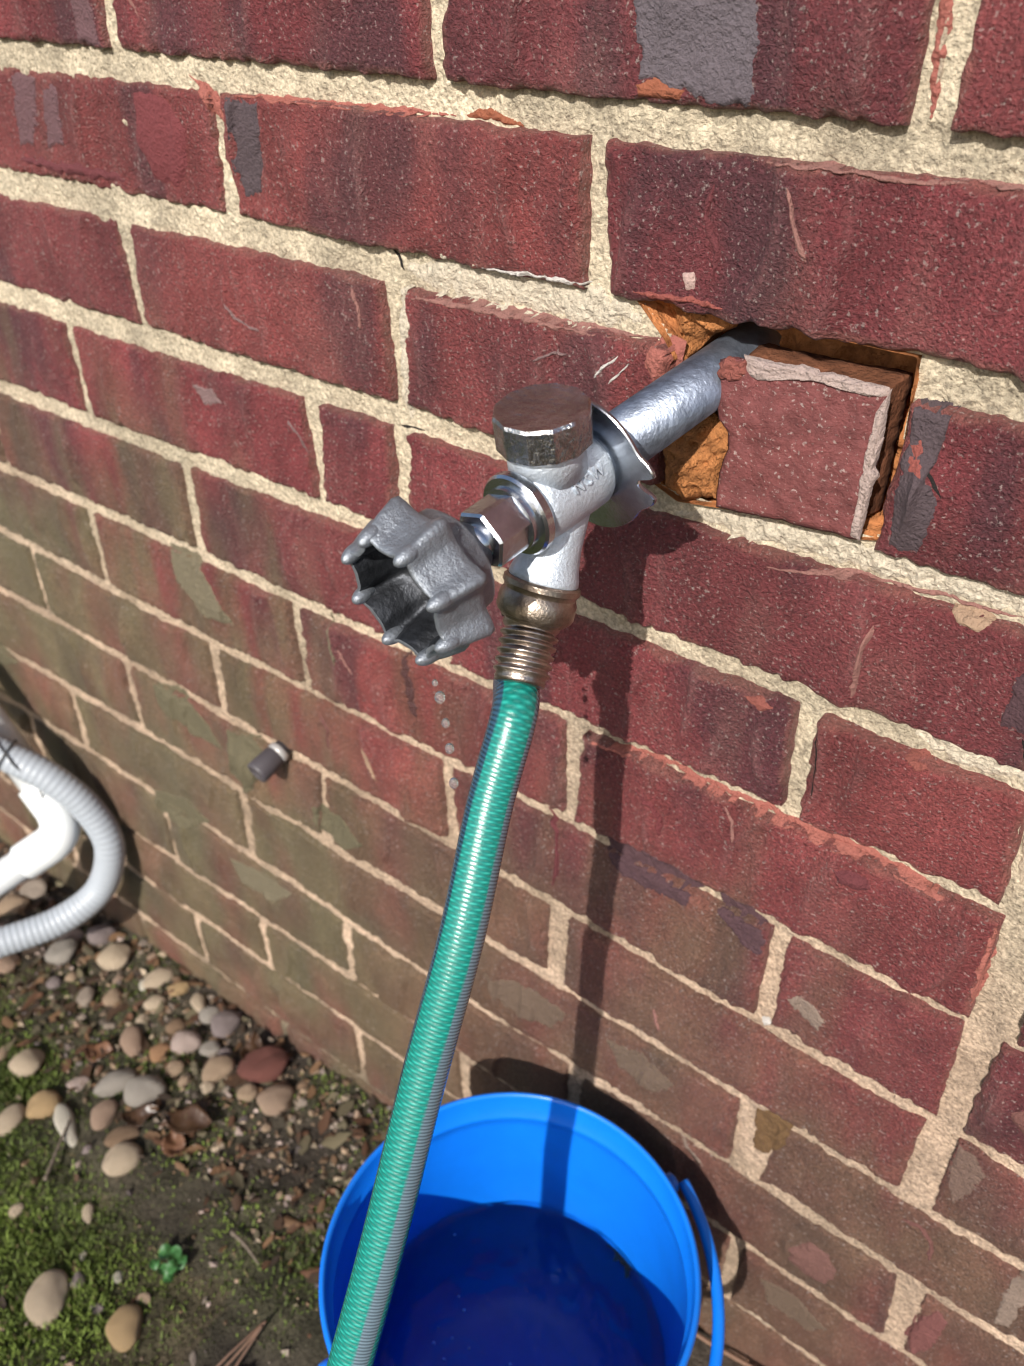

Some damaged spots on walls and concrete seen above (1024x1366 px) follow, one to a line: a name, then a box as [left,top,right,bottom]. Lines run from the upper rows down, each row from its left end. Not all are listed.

spalling [663,411,728,500]
spalling [908,440,923,479]